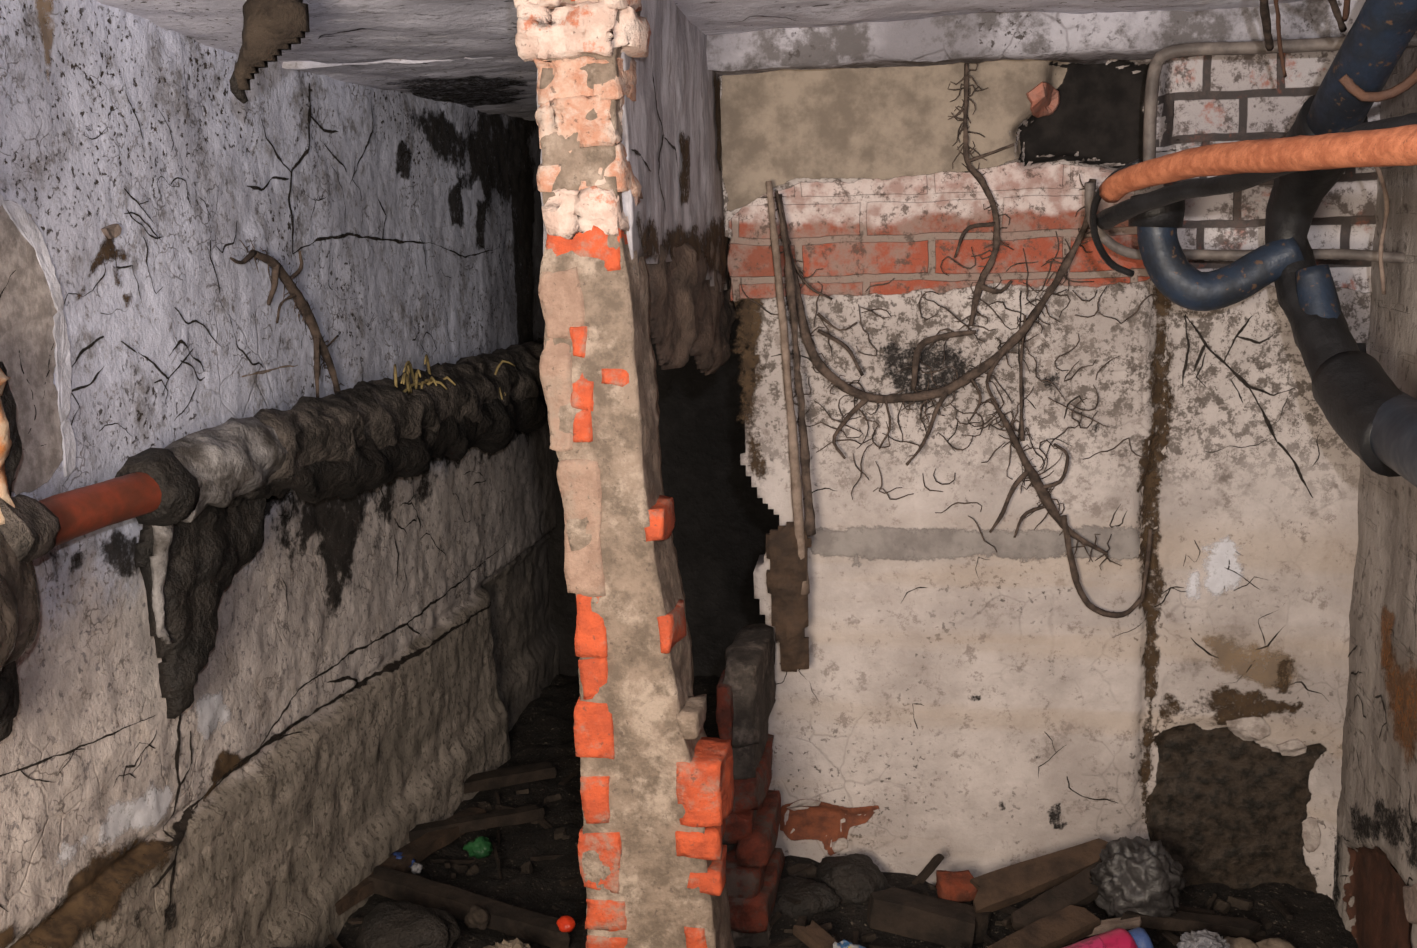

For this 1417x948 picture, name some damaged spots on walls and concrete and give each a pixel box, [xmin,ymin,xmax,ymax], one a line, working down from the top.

crack [13,68,497,481]
mould [382,75,537,345]
flaking render [720,51,1338,301]
peeling [1307,167,1378,293]
peeling [1367,101,1381,122]
crack [0,446,521,925]
leakage [1137,388,1175,530]
efflorescence [1186,536,1242,600]
leakage [1145,659,1341,910]